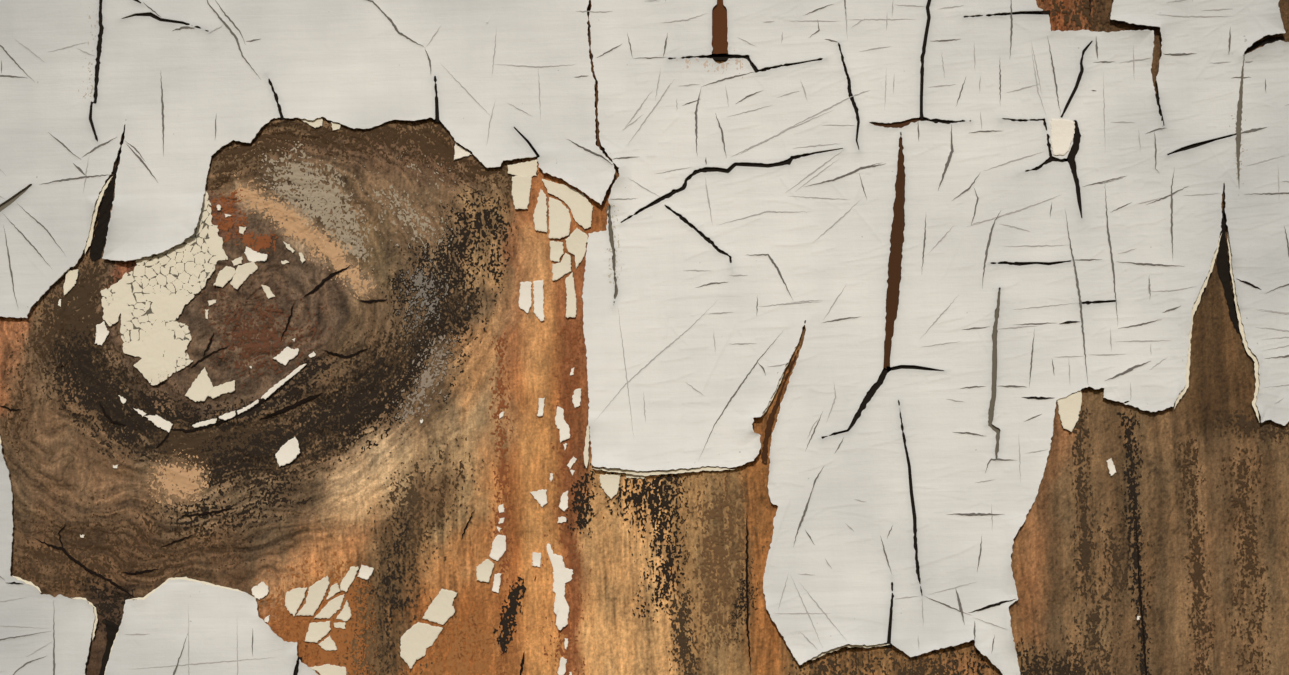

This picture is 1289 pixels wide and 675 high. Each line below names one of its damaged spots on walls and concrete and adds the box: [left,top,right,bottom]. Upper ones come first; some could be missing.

crack [368,0,441,122]
peeling [1036,0,1162,94]
peeling [1243,0,1289,56]
crack [0,0,286,306]
crack [514,128,540,159]
peeling [1050,119,1075,155]
crack [103,200,228,382]
crack [156,348,368,448]
peeling [0,117,1003,675]
crack [570,0,1289,671]
peeling [1009,184,1289,675]
crack [99,619,119,675]